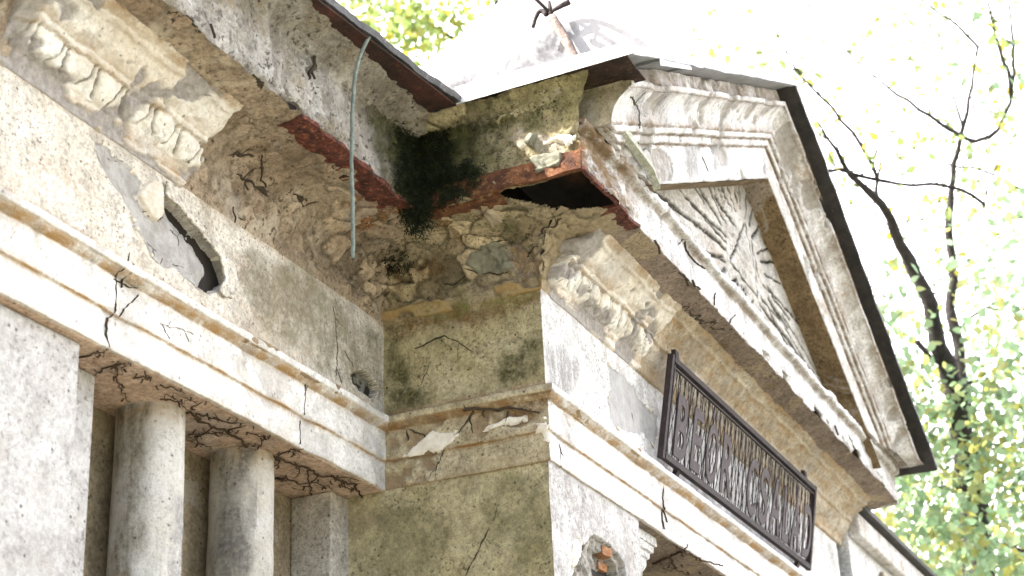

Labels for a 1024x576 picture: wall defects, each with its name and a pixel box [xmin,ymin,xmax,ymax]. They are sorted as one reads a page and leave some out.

flaking render [95,139,240,299]
crack [229,147,268,223]
crack [293,193,320,207]
flaking render [484,208,502,227]
crack [105,211,182,351]
flaking render [465,241,545,283]
crack [299,306,353,444]
spalling [353,372,375,395]
crack [405,429,443,477]
peeling [402,430,459,458]
peeling [483,415,551,443]
spalling [571,536,625,576]